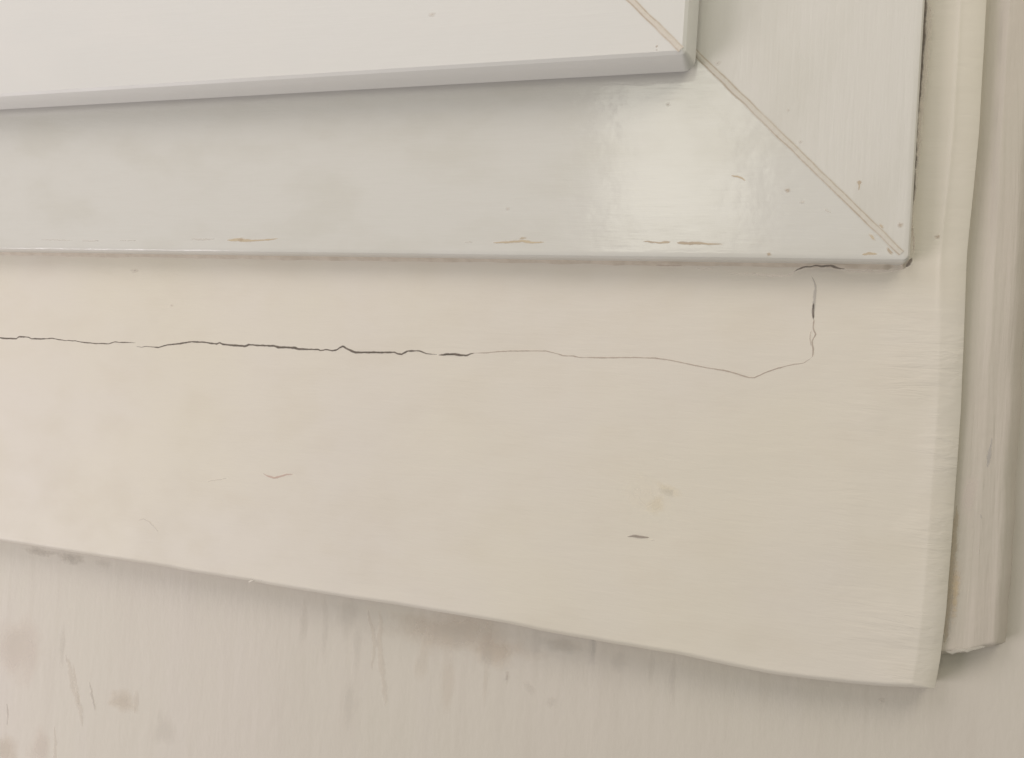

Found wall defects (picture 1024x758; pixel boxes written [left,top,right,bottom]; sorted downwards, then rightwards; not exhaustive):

crack [0,265,845,378]